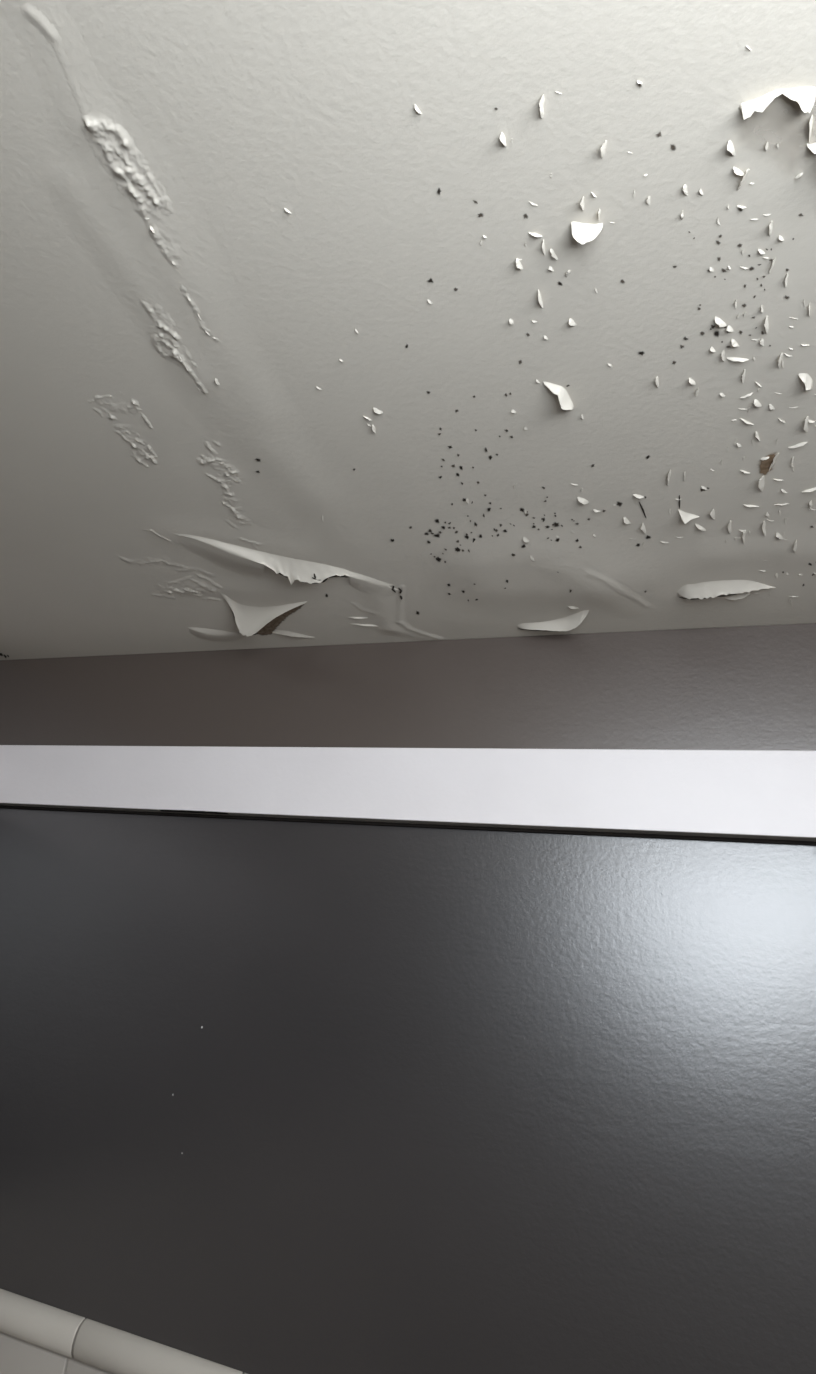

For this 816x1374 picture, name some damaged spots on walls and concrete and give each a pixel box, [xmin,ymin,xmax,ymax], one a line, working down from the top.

peeling [739,86,816,154]
peeling [571,192,613,244]
peeling [710,140,788,287]
peeling [516,232,570,277]
damp [673,244,789,364]
peeling [536,379,583,419]
peeling [571,301,816,552]
damp [409,427,622,563]
peeling [176,534,399,597]
peeling [677,560,816,606]
peeling [187,593,315,642]
peeling [517,606,589,631]